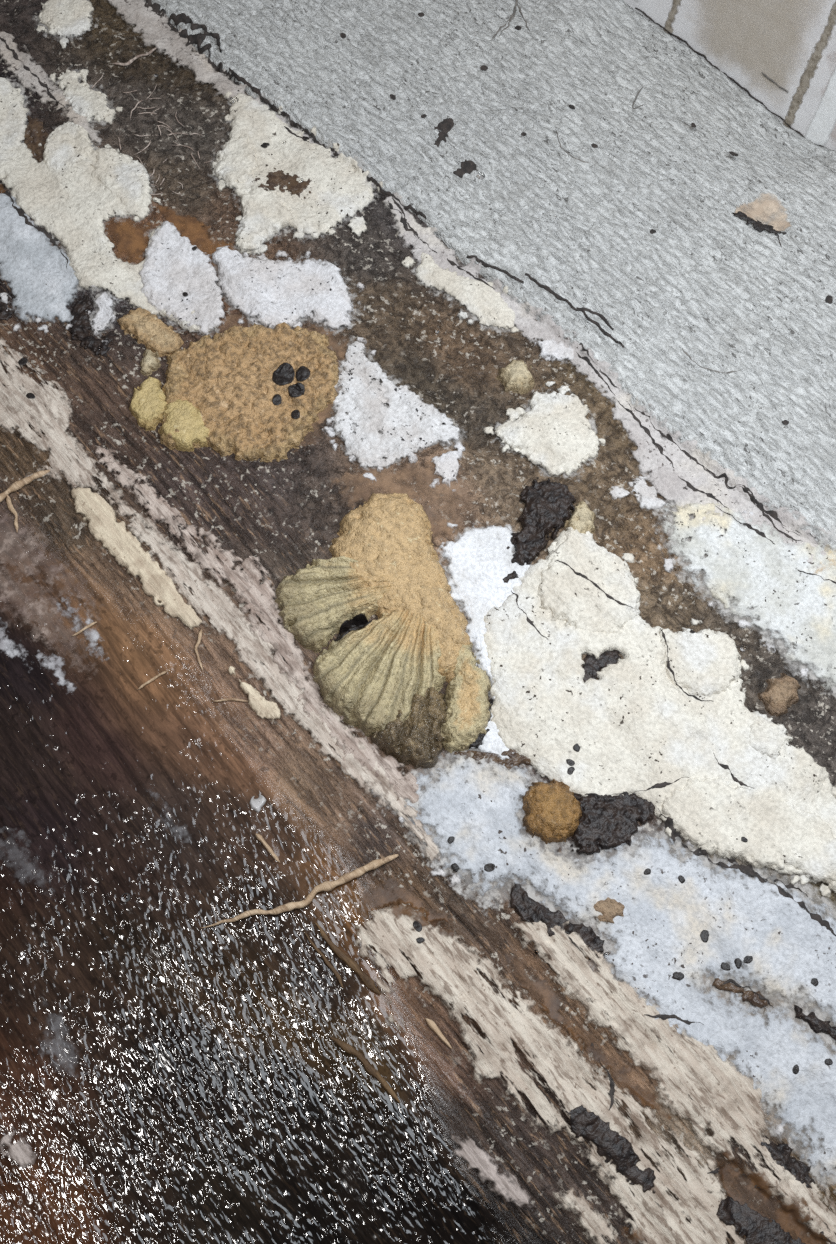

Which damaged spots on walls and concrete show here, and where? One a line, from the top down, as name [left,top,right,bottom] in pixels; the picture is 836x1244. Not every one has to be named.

spalling [732,193,791,247]
peeling [71,487,202,629]
peeling [95,446,419,803]
peeling [512,921,836,1244]
peeling [452,1136,530,1206]